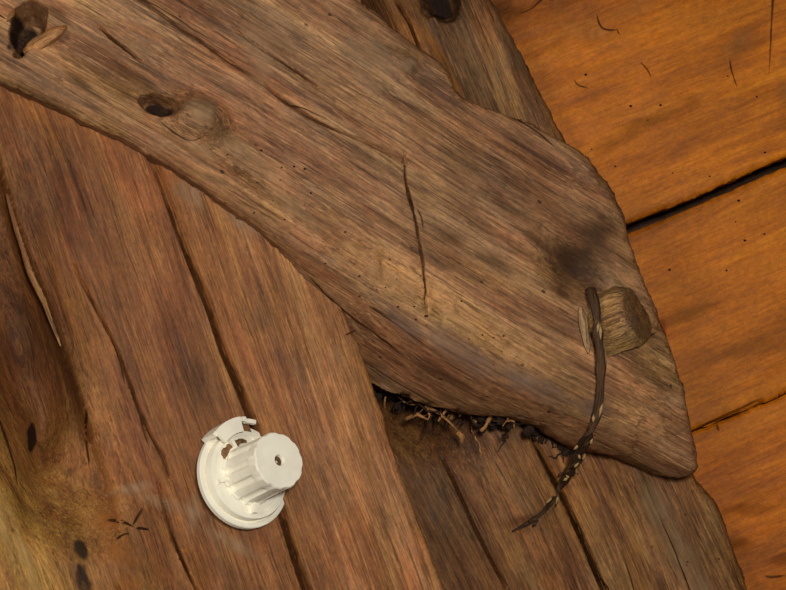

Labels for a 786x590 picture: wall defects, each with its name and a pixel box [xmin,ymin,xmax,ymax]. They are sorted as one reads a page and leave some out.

crack [404,167,426,302]
crack [165,201,255,430]
crack [112,342,157,448]
crack [108,510,148,539]
crack [169,529,194,585]
crack [278,512,306,590]
crack [530,437,609,590]